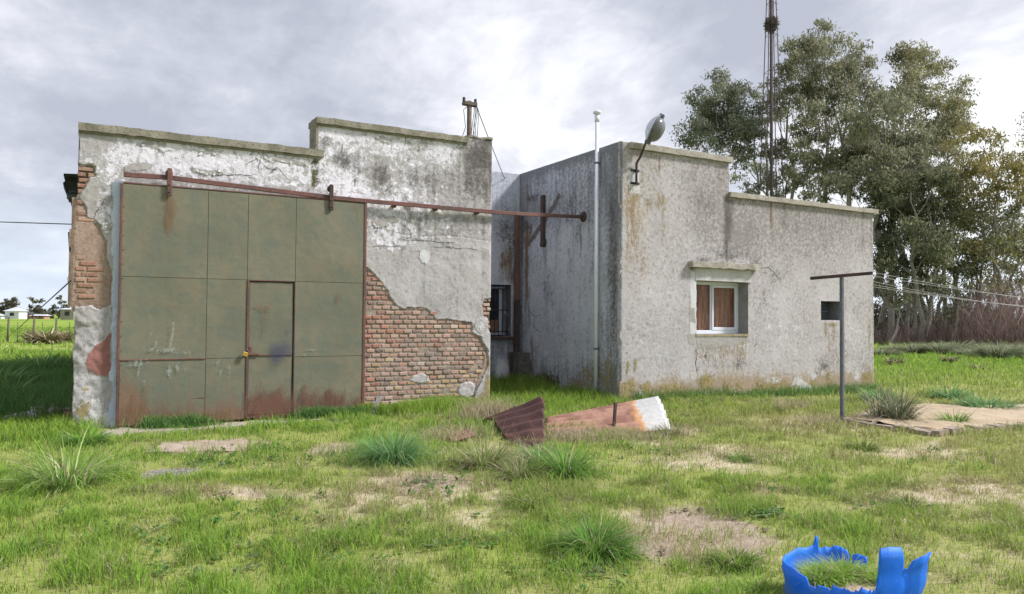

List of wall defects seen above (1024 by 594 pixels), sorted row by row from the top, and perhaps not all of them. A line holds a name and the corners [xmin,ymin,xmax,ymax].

peeling [191,147,225,176]
peeling [257,153,308,166]
damp [311,159,320,190]
damp [465,139,492,201]
flaking render [68,161,113,311]
damp [496,193,579,250]
flaking render [364,268,491,407]
damp [763,322,837,392]
rust [244,385,363,419]